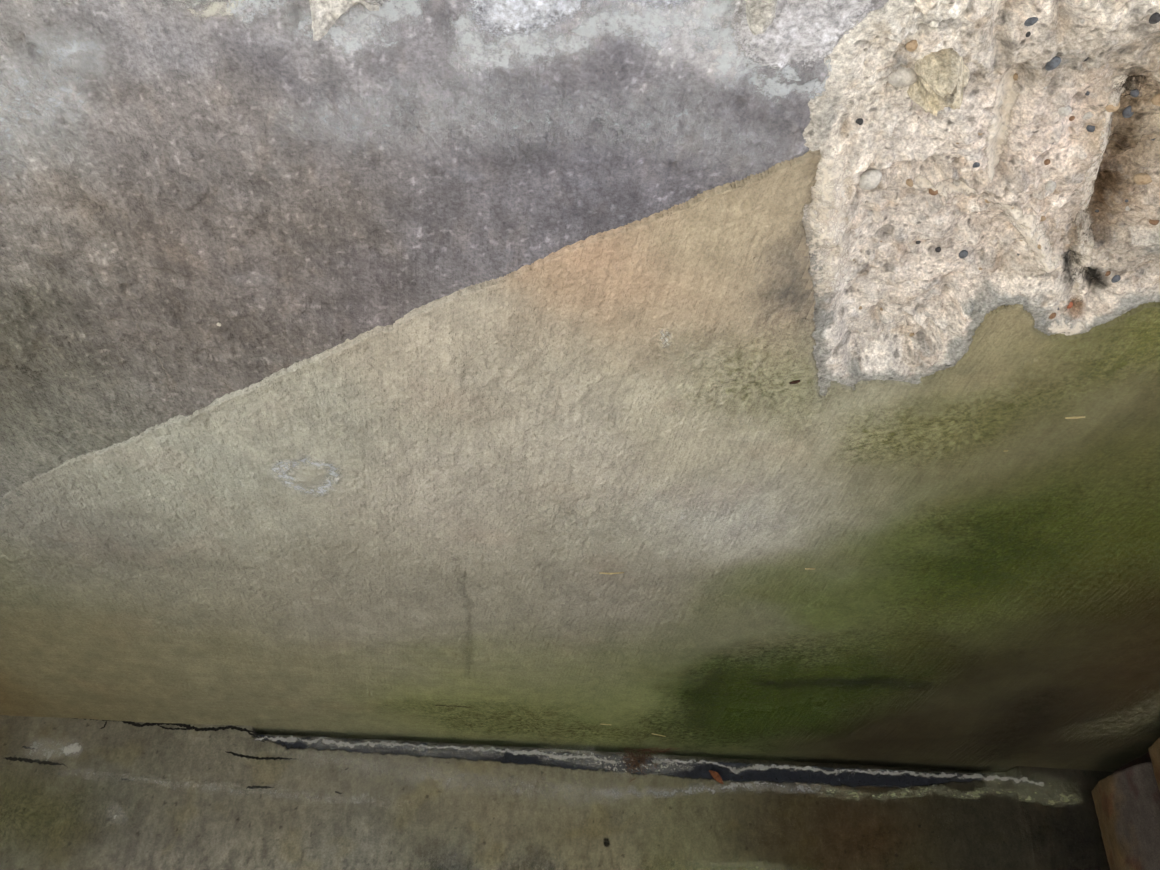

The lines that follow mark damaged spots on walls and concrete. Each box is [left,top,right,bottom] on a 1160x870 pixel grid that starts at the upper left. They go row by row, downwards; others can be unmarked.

peeling [0,0,1160,511]
water stain [600,781,936,798]
water stain [953,774,1078,805]